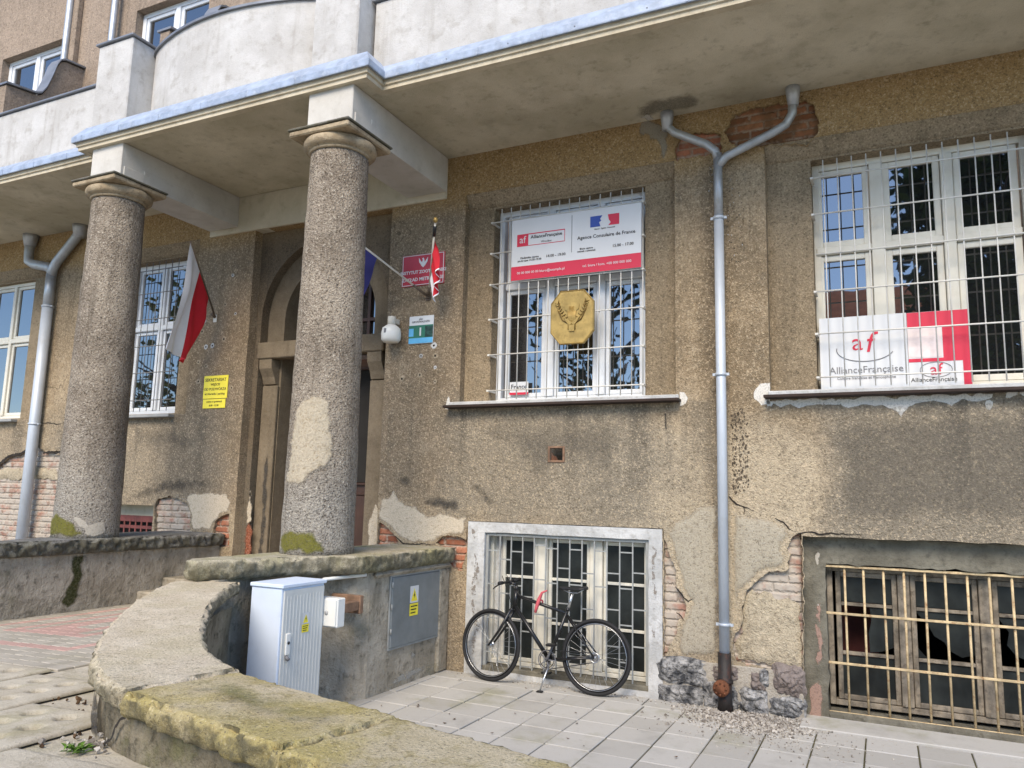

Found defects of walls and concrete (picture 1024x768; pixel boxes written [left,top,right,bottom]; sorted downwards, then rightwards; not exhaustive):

flaking render [674,99,820,182]
flaking render [286,397,332,483]
flaking render [0,448,60,541]
flaking render [153,493,230,548]
crack [728,496,860,535]
leakage [62,556,83,606]
flaking render [368,491,479,653]
flaking render [652,529,687,656]
flaking render [731,532,823,671]
peeling [810,683,822,716]